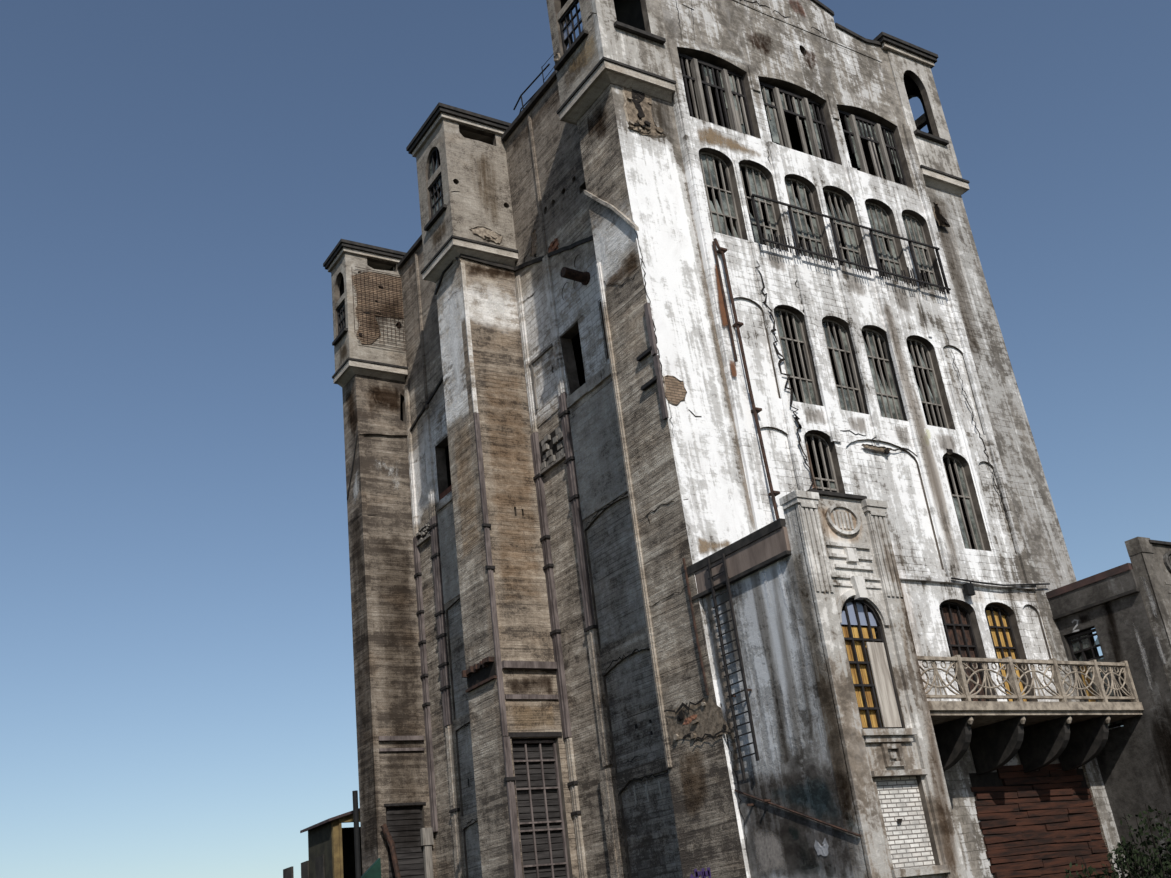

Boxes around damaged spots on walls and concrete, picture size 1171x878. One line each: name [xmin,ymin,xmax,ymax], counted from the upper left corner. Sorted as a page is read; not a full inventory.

corrosion [715,265,728,327]
spalling [663,375,687,406]
spalling [666,697,731,745]